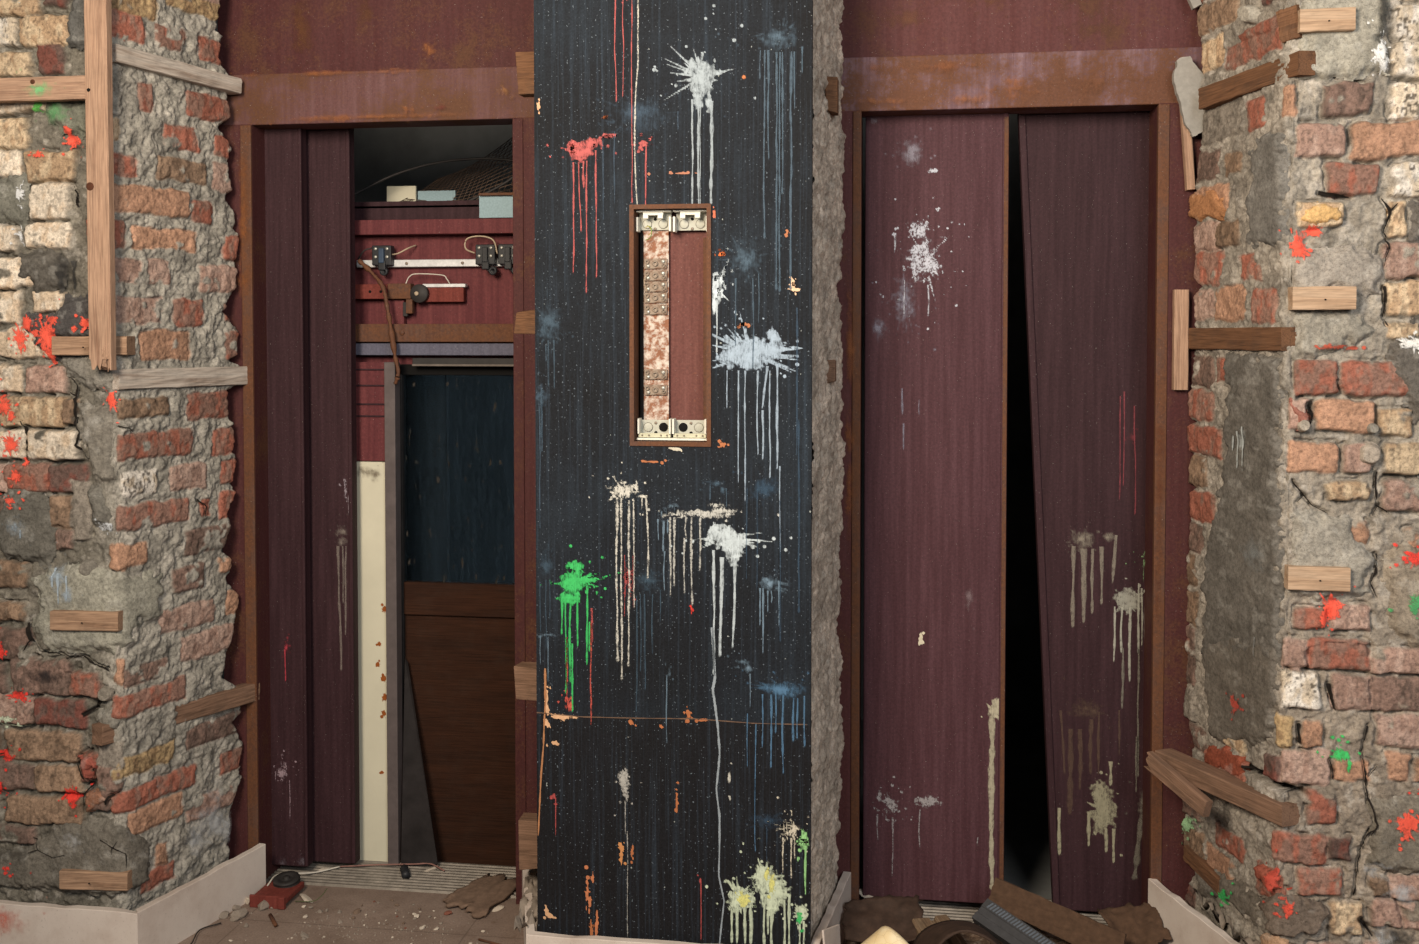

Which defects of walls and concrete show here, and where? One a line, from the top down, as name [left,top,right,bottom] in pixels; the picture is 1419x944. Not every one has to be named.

peeling [1187,0,1202,10]
peeling [1172,56,1204,138]
spalling [1188,190,1226,222]
spalling [1300,201,1342,225]
spalling [1289,397,1311,431]
spalling [1204,745,1250,776]
spalling [77,755,111,812]
spalling [1253,862,1330,944]